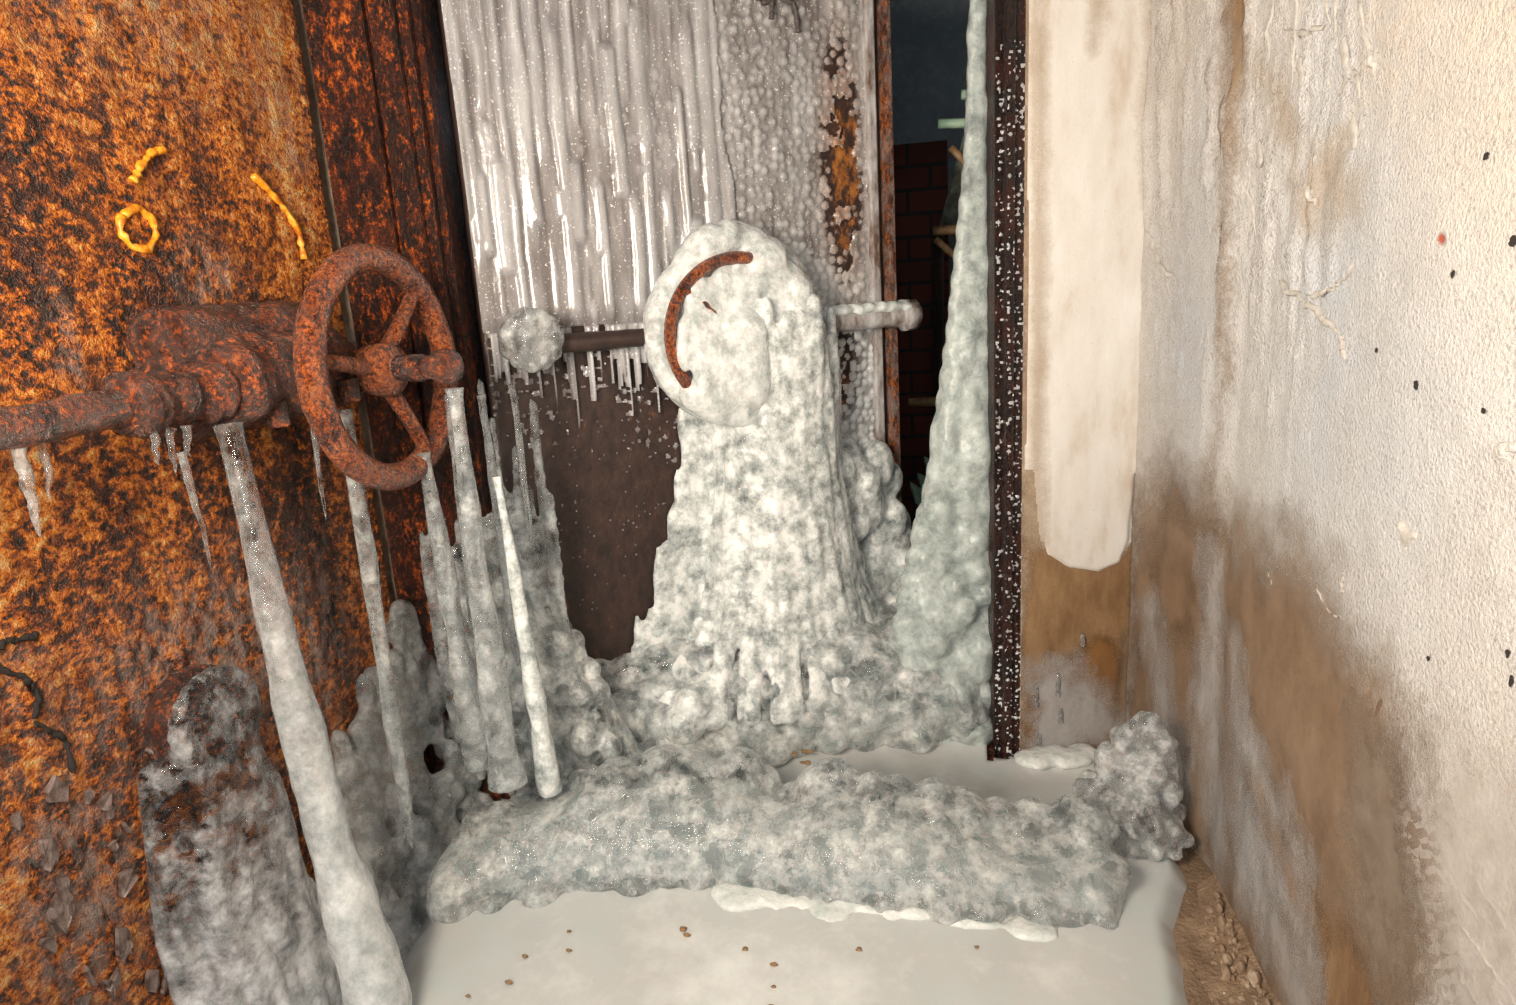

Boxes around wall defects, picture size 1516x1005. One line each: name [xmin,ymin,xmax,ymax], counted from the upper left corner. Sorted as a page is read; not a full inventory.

crack [0,631,77,773]
water stain [1022,479,1425,1005]
rust [10,811,24,831]
rust [43,775,141,852]
rust [37,837,75,954]
rust [117,868,138,898]
rust [74,926,133,1005]
rust [144,969,168,995]